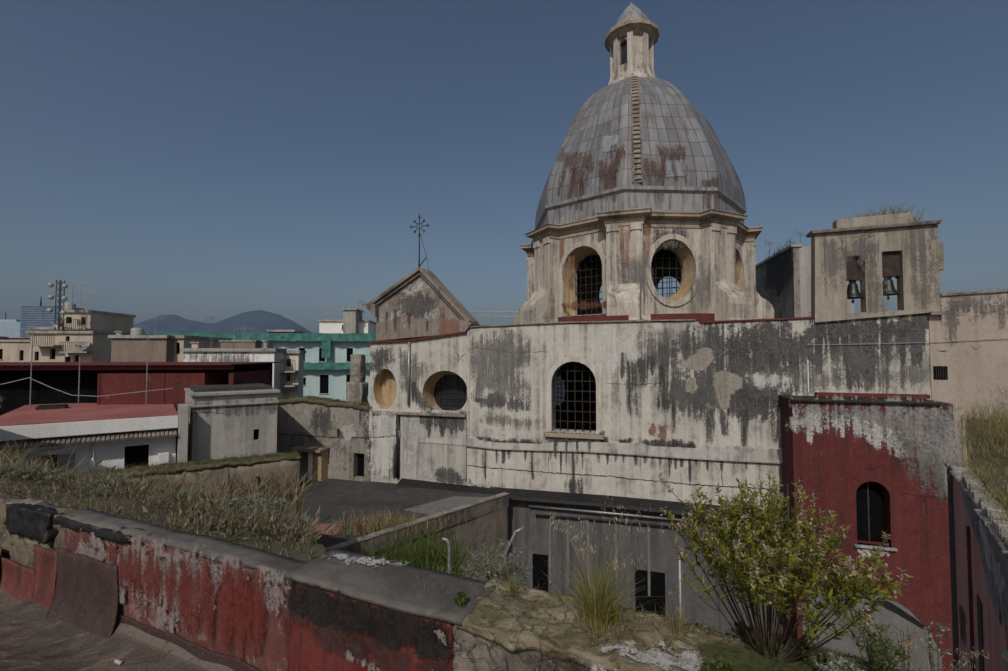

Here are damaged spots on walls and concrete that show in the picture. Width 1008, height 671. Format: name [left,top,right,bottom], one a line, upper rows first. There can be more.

corrosion [558,143,624,209]
corrosion [643,145,687,200]
leakage [385,289,439,334]
leakage [367,346,467,437]
leakage [470,225,1008,498]
leakage [435,467,471,485]
peeling [785,395,964,494]
flaking render [0,491,79,570]
peeling [75,529,245,633]
peeling [257,579,287,617]
peeling [857,548,890,557]
peeling [960,476,1008,633]